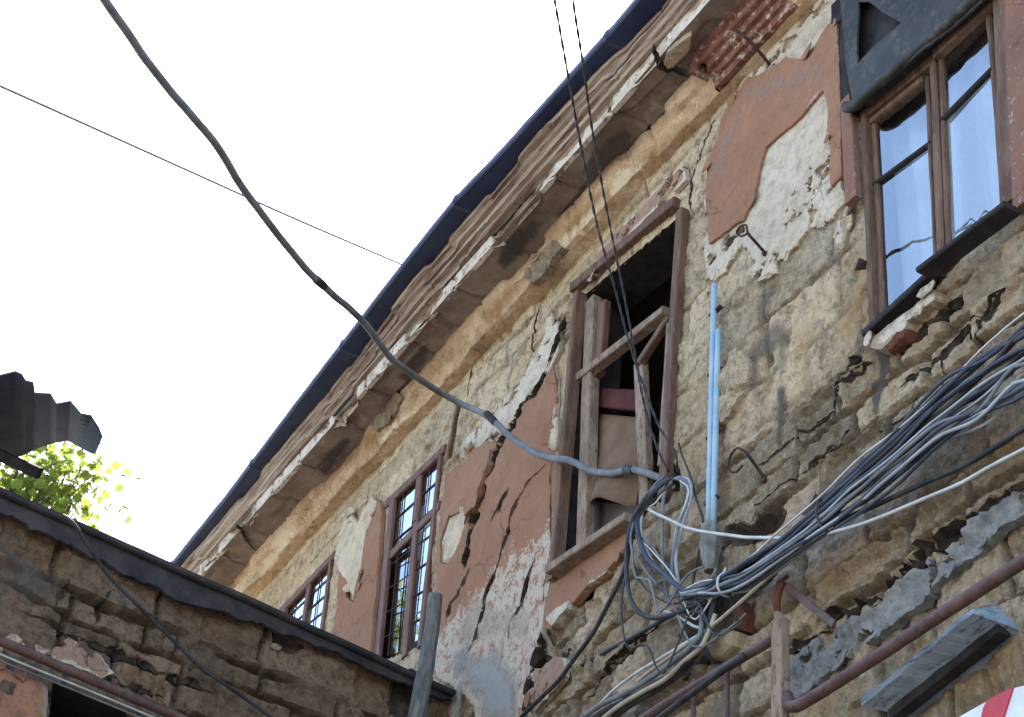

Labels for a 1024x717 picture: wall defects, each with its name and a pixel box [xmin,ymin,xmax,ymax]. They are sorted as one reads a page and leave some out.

crack [652,44,687,76]
crack [689,120,715,213]
flaking render [587,0,855,299]
spalling [523,240,568,287]
crack [19,578,215,698]
flaking render [331,495,385,653]
spalling [387,681,413,717]
crack [444,304,567,655]
flaking render [432,306,627,717]
spalling [802,490,818,515]
crack [754,355,873,506]
crack [879,287,1006,433]